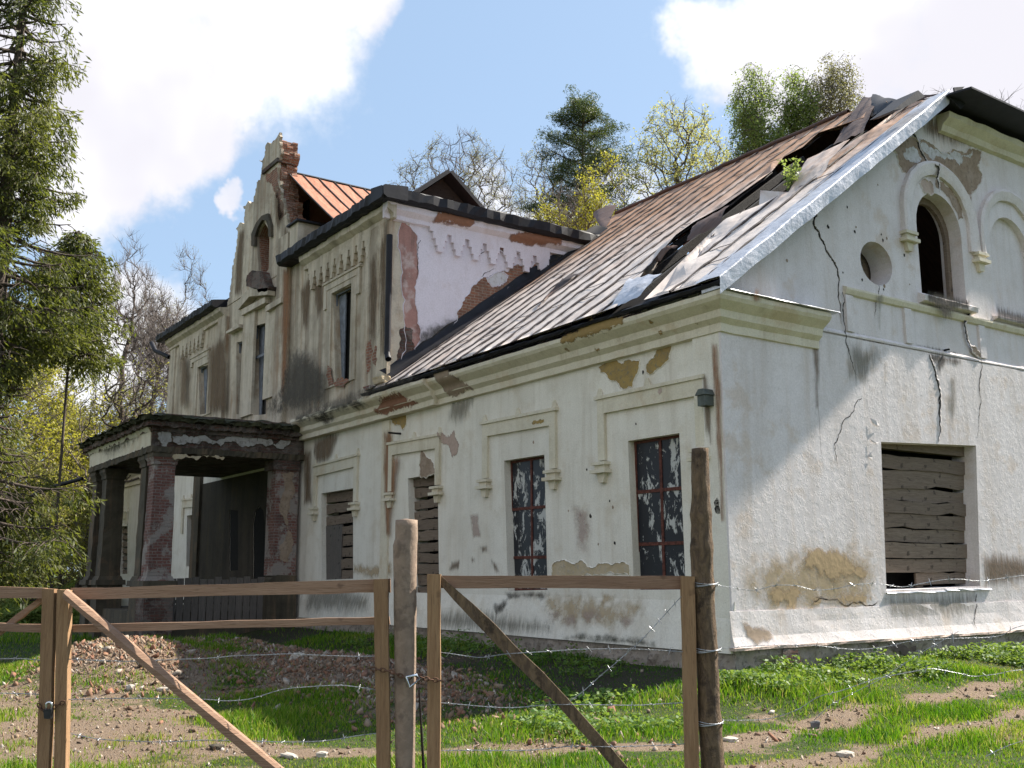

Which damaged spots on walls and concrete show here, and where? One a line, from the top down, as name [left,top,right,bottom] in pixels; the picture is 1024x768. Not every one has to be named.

spalling [894,136,983,220]
spalling [397,222,421,360]
flaking render [456,231,562,322]
crack [813,212,856,374]
peeling [158,428,291,460]
water stain [266,354,412,421]
flaking render [374,392,418,431]
spalling [598,346,673,390]
crack [834,398,862,460]
crack [929,355,942,441]
crack [964,299,983,442]
peeling [751,548,871,609]